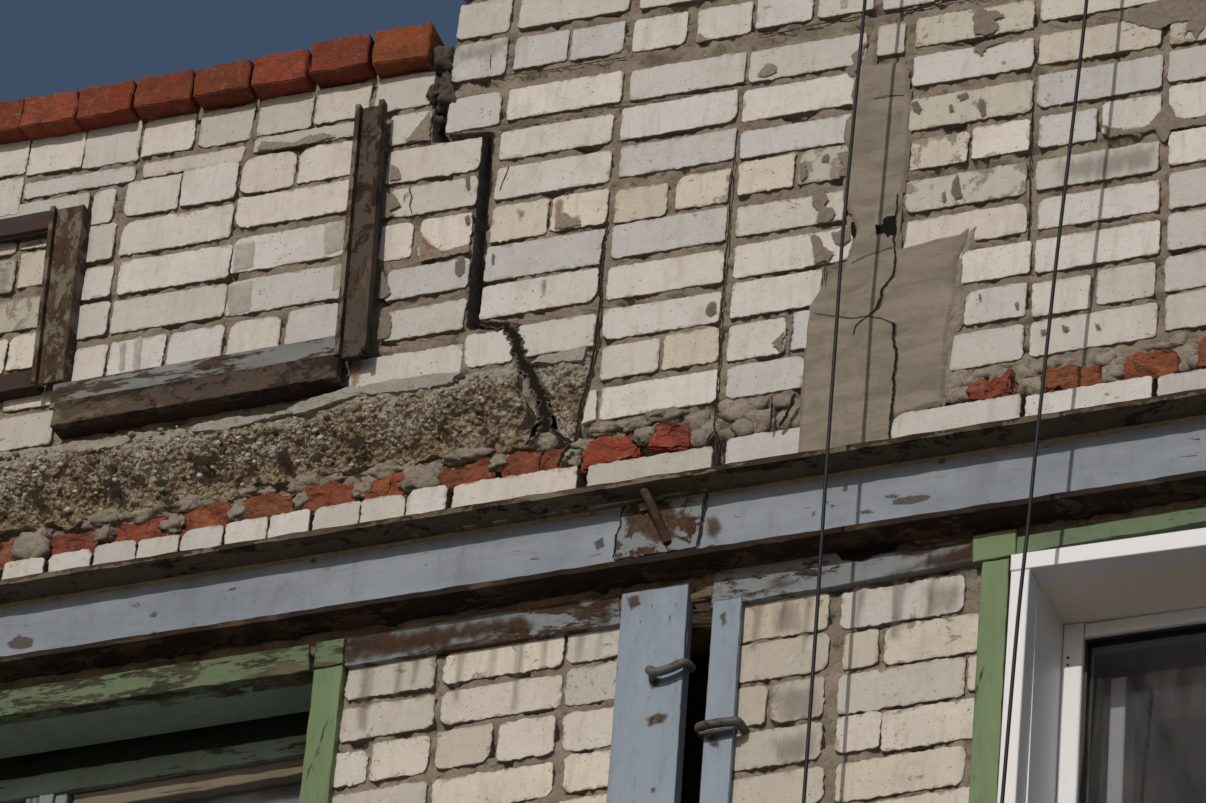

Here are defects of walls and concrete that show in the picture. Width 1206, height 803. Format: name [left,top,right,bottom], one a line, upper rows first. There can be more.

crack [432,105,609,475]
crack [816,193,898,439]
spalling [0,345,598,540]
peeling [7,634,33,649]